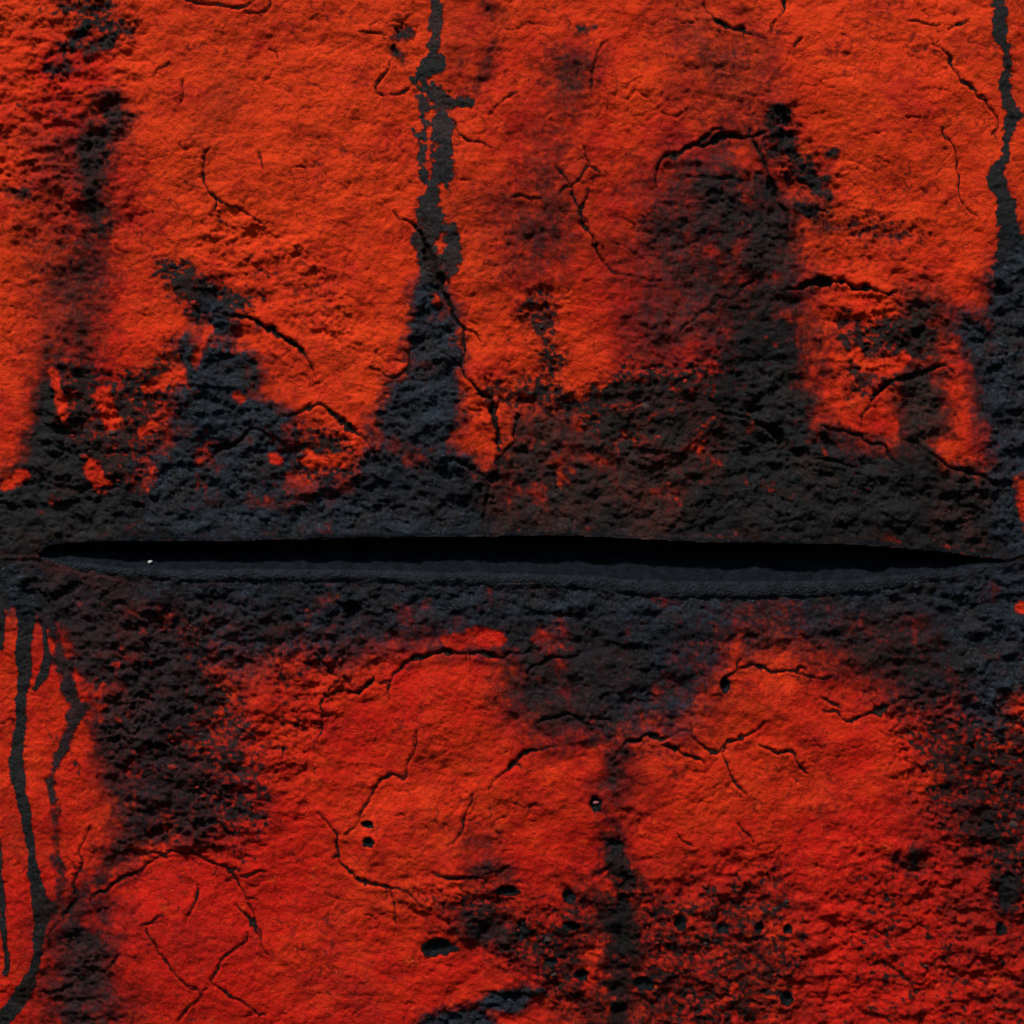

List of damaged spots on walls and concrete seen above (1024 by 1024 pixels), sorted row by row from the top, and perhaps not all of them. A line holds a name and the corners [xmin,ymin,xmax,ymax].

leakage [411,85,430,185]
crack [655,117,789,230]
leakage [728,180,800,384]
leakage [32,622,51,691]
crack [315,647,579,741]
leakage [172,590,959,742]
crack [720,659,920,723]
crack [43,828,268,1021]
crack [318,730,424,924]
crack [432,867,507,884]
crack [448,713,612,846]
crack [610,723,806,794]